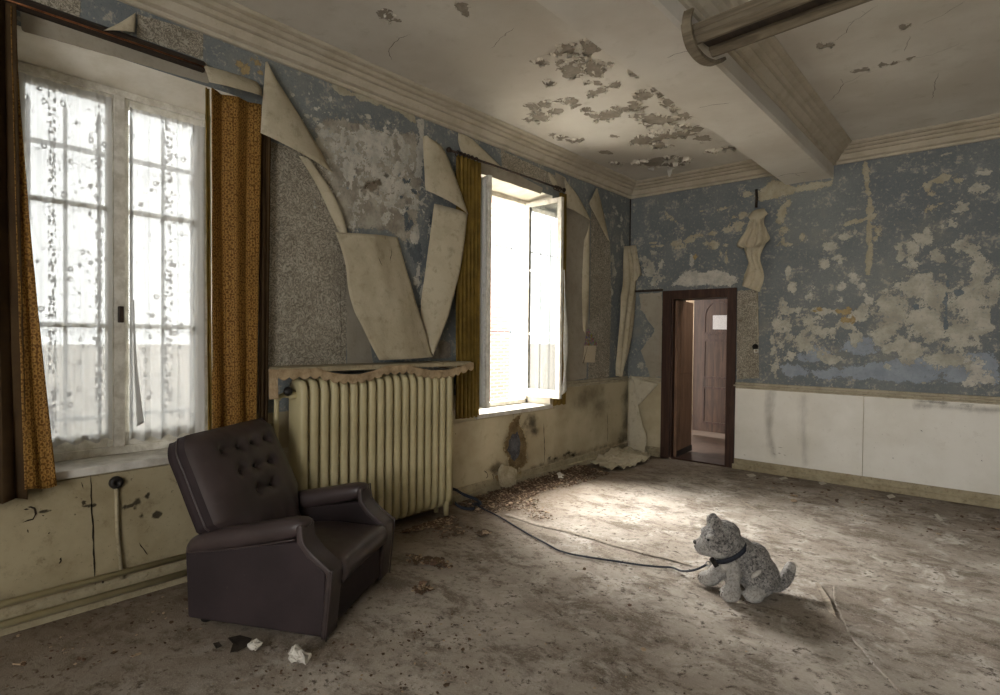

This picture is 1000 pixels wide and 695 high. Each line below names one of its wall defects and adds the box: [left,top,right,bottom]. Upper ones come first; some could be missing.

peeling [454,2,469,18]
peeling [523,38,737,177]
peeling [850,56,917,74]
peeling [302,82,433,305]
peeling [740,176,834,248]
peeling [768,161,1000,388]
spalling [432,340,451,359]
crack [88,476,96,577]